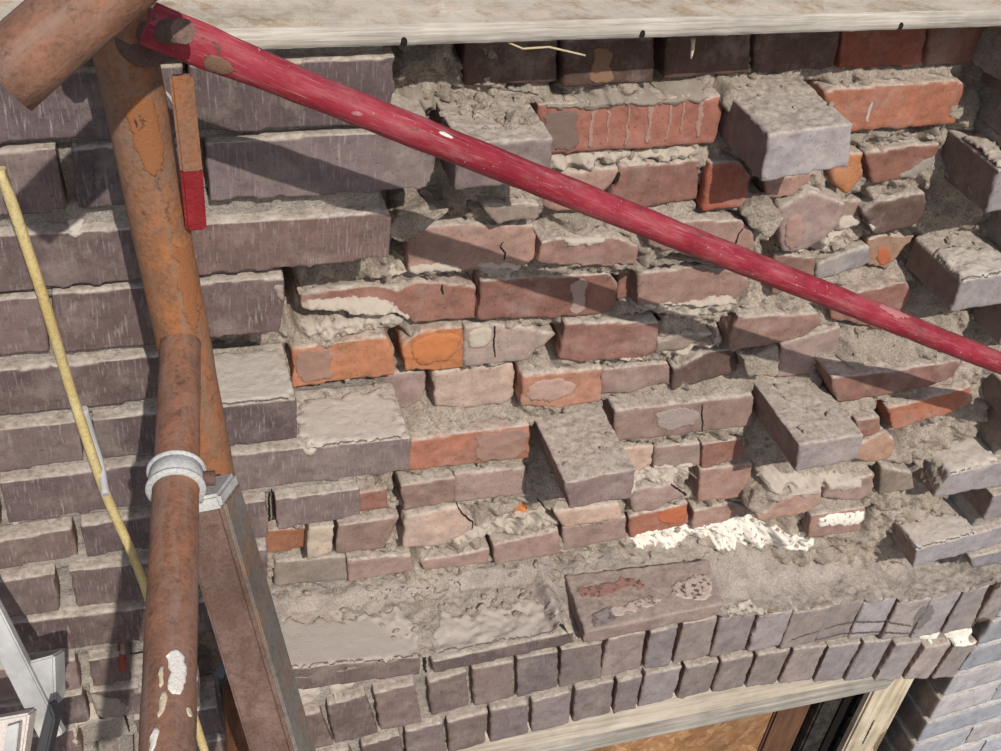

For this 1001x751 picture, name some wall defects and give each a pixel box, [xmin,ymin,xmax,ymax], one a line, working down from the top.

spalling [397,85,449,115]
water stain [664,101,704,141]
spalling [898,156,935,178]
peeling [879,304,910,319]
spalling [411,333,461,365]
peeling [526,378,577,403]
peeling [655,407,700,431]